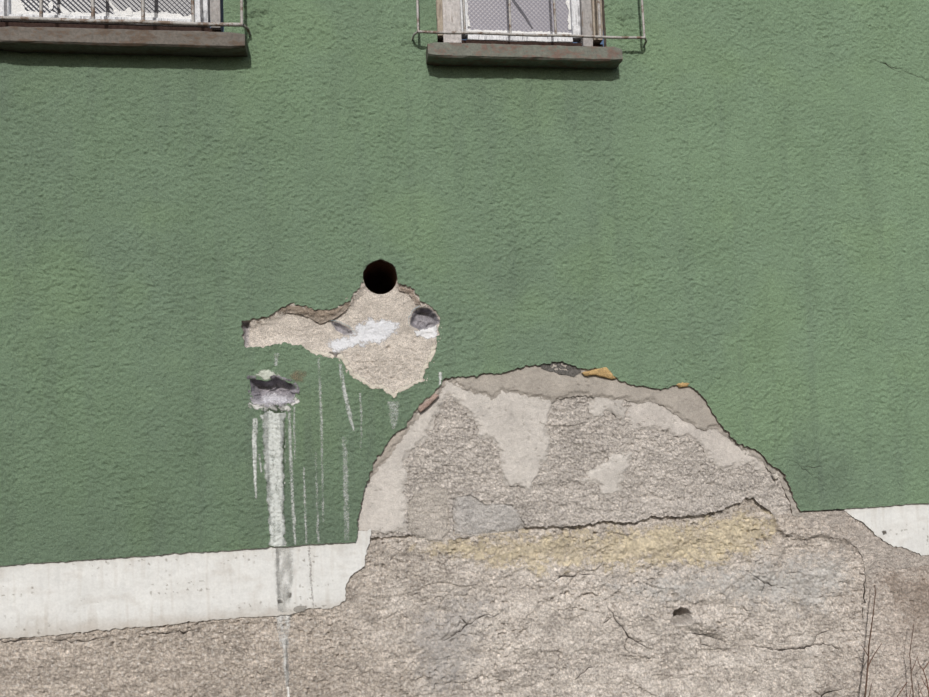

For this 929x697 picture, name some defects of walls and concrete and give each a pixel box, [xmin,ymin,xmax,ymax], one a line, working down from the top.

spalling [242,280,442,398]
spalling [247,370,300,411]
water stain [339,364,362,430]
water stain [252,393,319,601]
spalling [343,361,929,697]
crack [604,606,648,650]
crack [759,631,844,655]